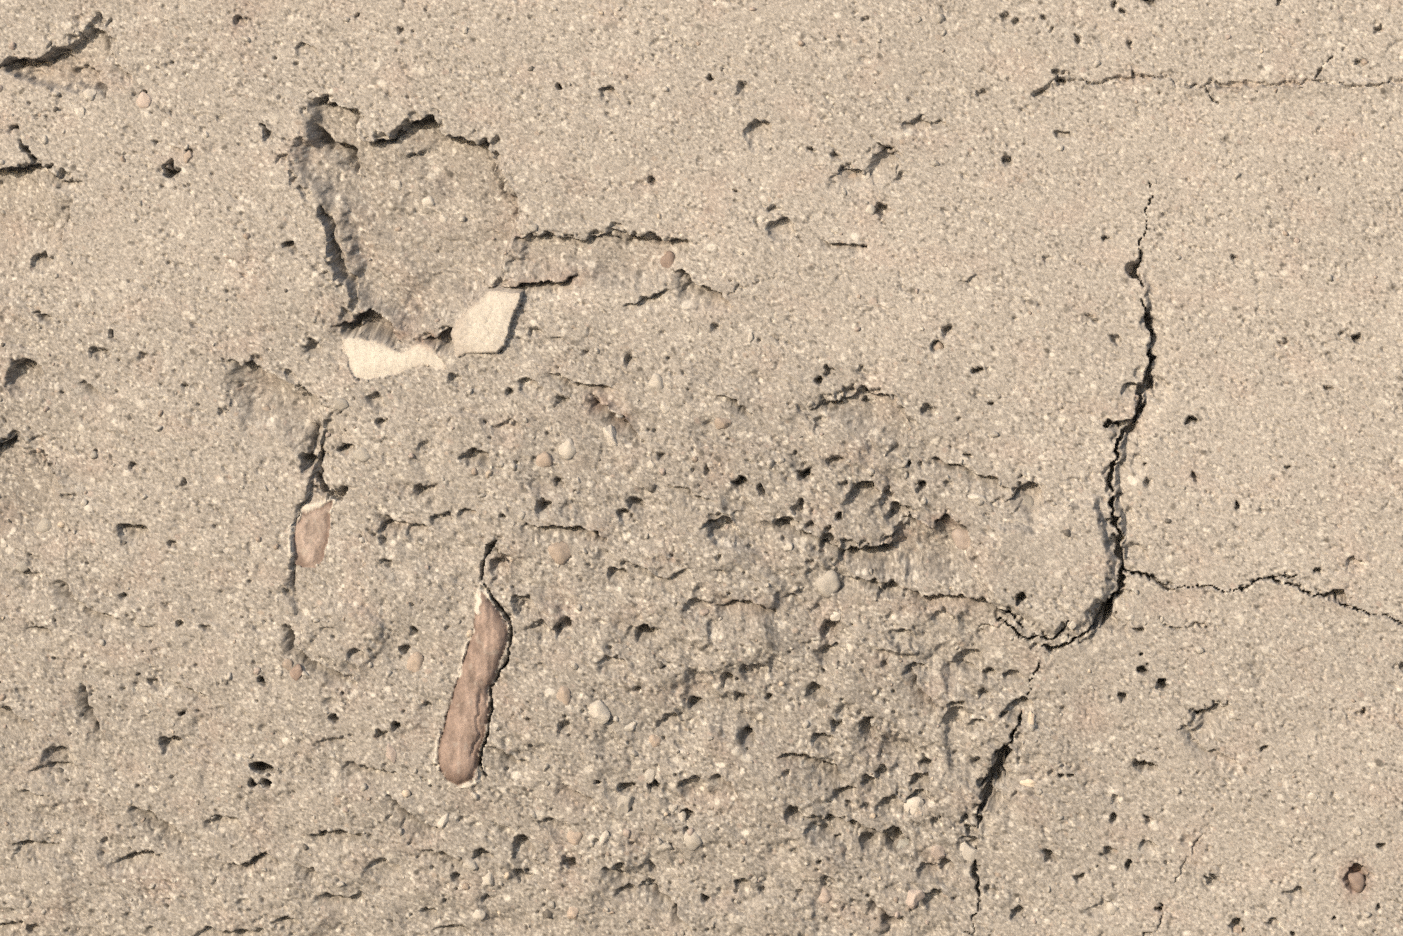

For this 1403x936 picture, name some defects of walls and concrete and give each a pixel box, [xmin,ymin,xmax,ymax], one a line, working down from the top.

spalling [599,85,620,103]
crack [1042,57,1403,114]
spalling [260,91,730,357]
crack [478,538,514,780]
crack [953,163,1403,936]